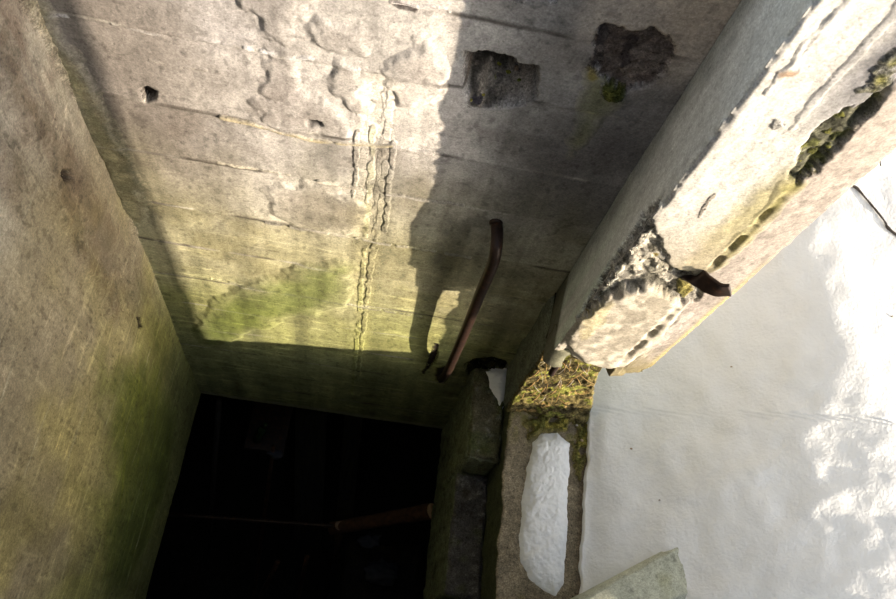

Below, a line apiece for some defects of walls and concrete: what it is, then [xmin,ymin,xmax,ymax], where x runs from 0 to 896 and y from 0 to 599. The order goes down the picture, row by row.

spalling [461,50,540,109]
spalling [585,22,677,103]
damp [761,0,856,97]
damp [787,0,896,131]
damp [216,0,472,395]
spalling [578,191,703,320]